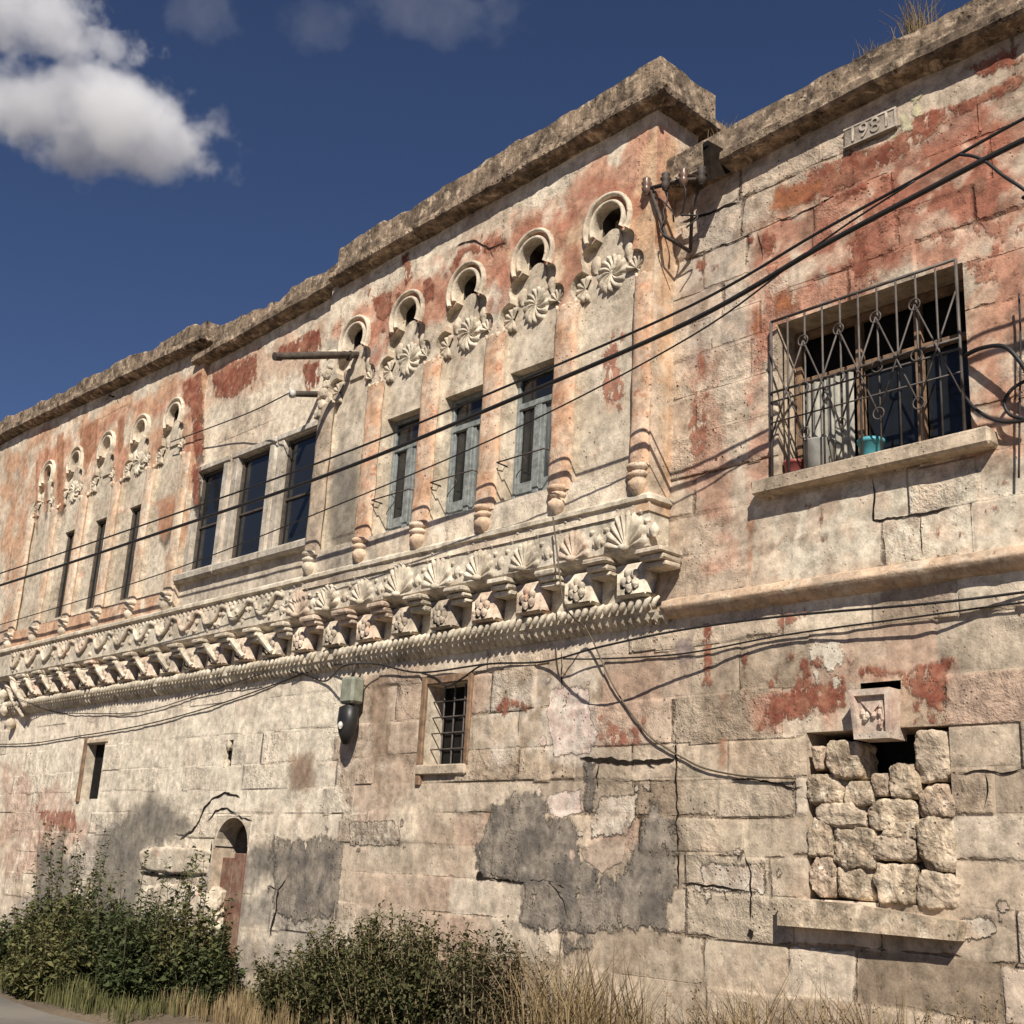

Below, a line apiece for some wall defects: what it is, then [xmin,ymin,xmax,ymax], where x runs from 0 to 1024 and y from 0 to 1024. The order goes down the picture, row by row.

peeling [804,45,1024,205]
crack [455,239,507,257]
peeling [929,227,955,243]
peeling [212,348,259,398]
peeling [758,654,847,731]
peeling [848,657,955,723]
crack [140,792,252,882]
crack [269,878,287,934]